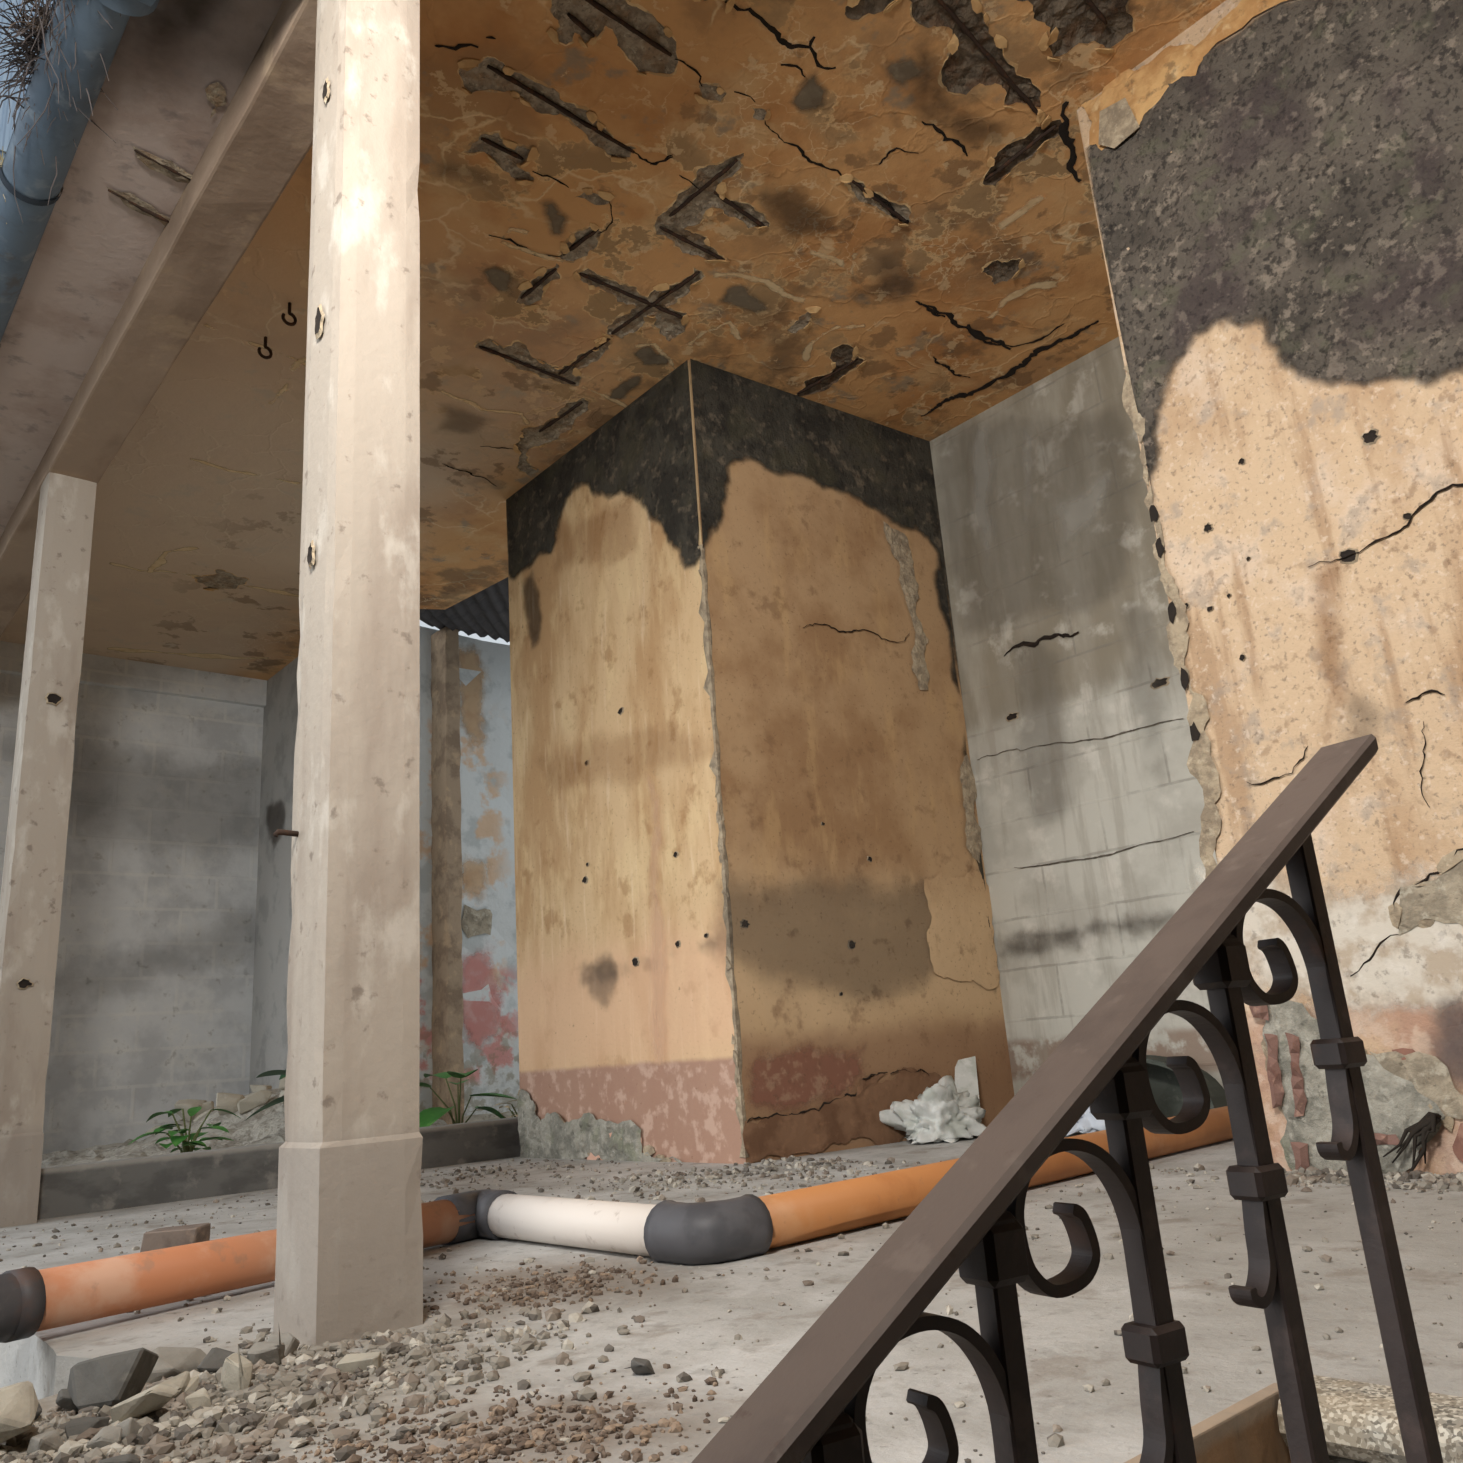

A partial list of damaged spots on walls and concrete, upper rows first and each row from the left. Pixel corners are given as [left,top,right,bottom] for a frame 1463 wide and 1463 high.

crack [725,1,836,77]
crack [675,59,968,222]
spalling [845,0,1062,189]
peeling [1081,0,1287,151]
spalling [474,153,867,476]
crack [1309,483,1463,567]
crack [1405,689,1445,807]
damp [1243,874,1312,996]
damp [1324,876,1463,1079]
crack [1351,848,1463,976]
spalling [1249,1001,1347,1172]
spalling [1360,1048,1463,1174]